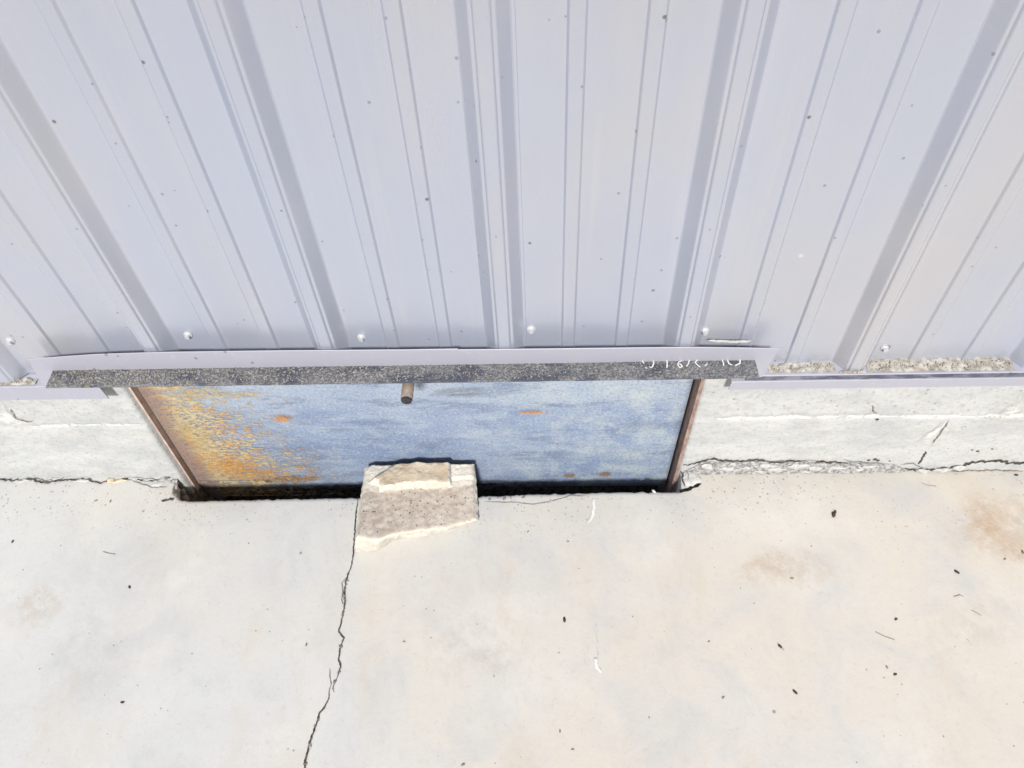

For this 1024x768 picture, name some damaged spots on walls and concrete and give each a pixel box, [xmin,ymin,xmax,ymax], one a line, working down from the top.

crack [0,477,164,488]
corrosion [137,386,351,496]
crack [683,421,1024,475]
crack [303,499,358,768]